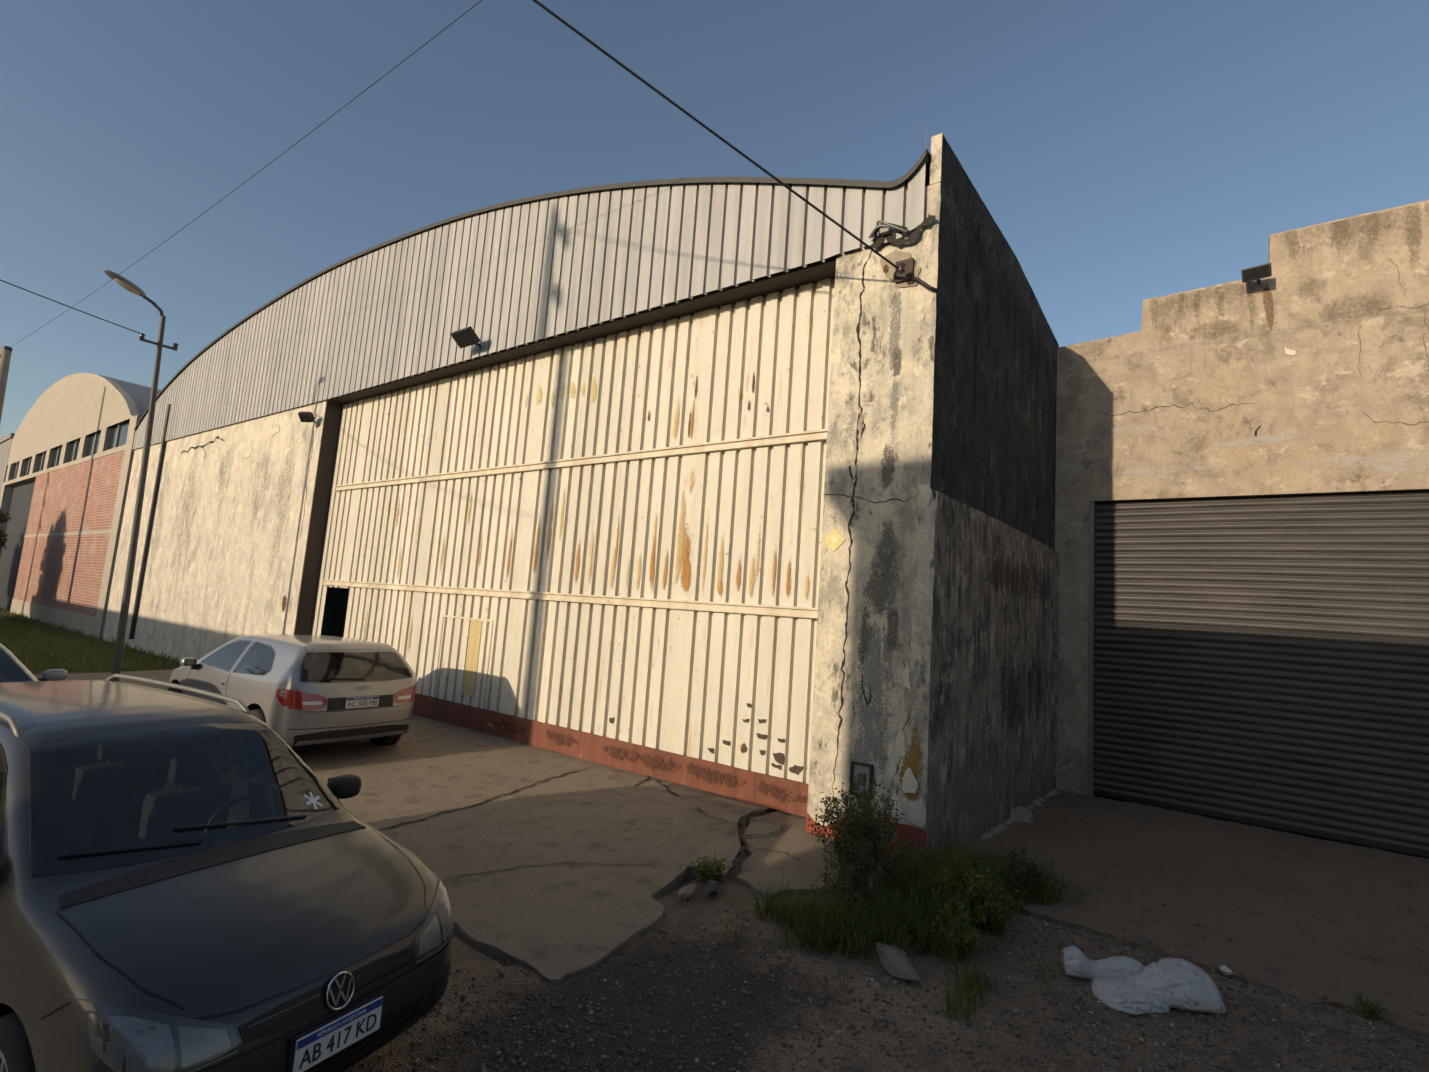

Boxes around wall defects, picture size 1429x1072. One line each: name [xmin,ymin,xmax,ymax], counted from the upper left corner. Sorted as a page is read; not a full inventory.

crack [1263,285,1274,330]
crack [1358,259,1429,426]
corrosion [673,377,697,438]
crack [1094,402,1265,443]
corrosion [533,491,565,572]
corrosion [609,468,809,599]
crack [823,214,936,796]
peeling [870,715,926,843]